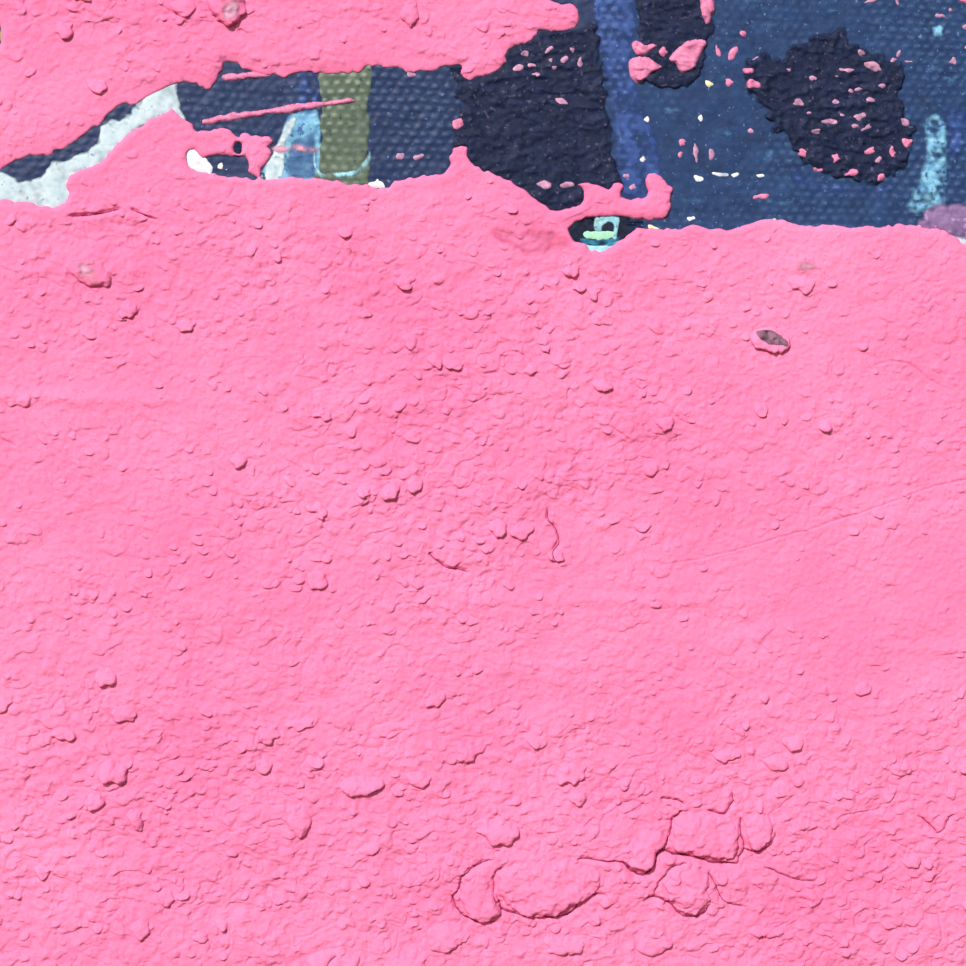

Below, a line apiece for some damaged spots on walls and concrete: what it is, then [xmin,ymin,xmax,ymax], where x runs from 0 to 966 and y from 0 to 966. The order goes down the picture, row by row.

peeling [0,0,966,252]
crack [452,860,606,922]
crack [577,792,811,917]